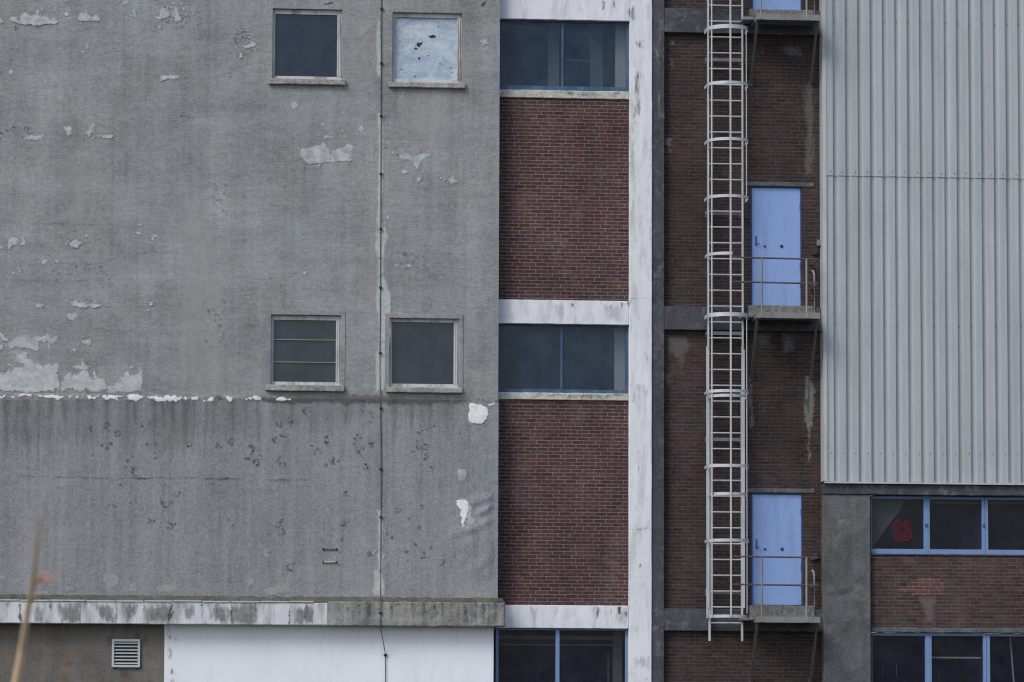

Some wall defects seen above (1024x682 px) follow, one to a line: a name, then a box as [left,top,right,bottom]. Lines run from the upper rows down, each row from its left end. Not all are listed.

peeling [0,0,102,37]
peeling [298,123,365,166]
peeling [392,151,433,182]
peeling [0,297,232,402]
spalling [468,403,495,424]
peeling [456,498,475,527]
water stain [35,602,80,624]
water stain [96,604,170,623]
water stain [186,603,256,624]
water stain [288,604,313,625]